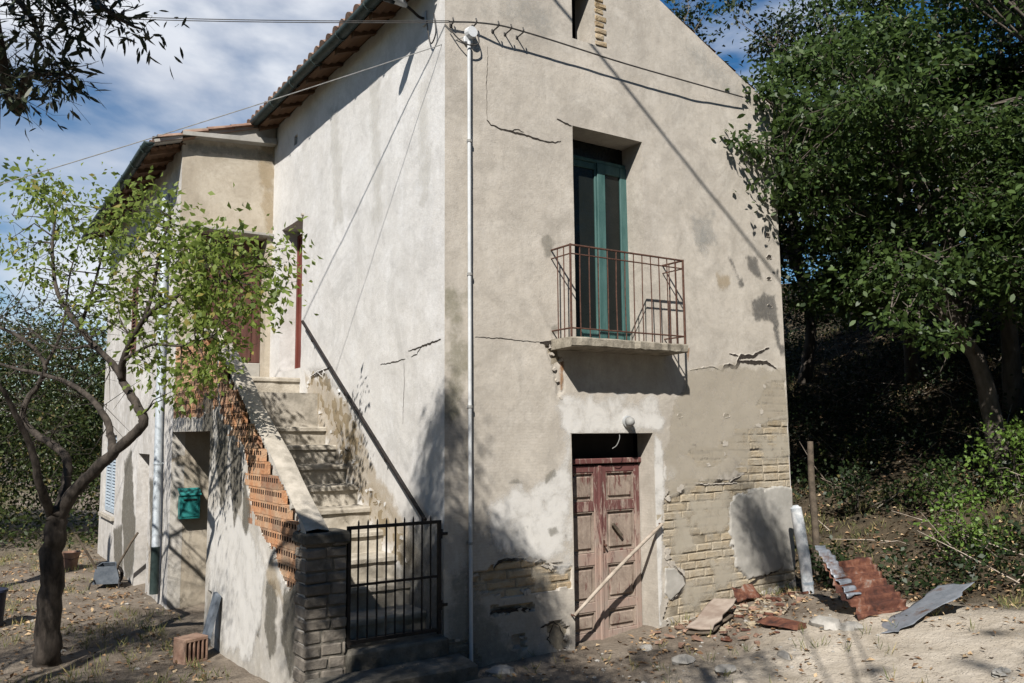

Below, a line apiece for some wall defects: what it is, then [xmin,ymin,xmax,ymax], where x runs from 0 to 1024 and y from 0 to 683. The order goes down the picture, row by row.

crack [487,119,572,143]
crack [380,339,441,406]
crack [485,337,551,349]
crack [690,347,777,371]
spalling [173,339,321,591]
spalling [652,379,795,626]
spalling [473,556,571,619]
spalling [546,621,572,652]